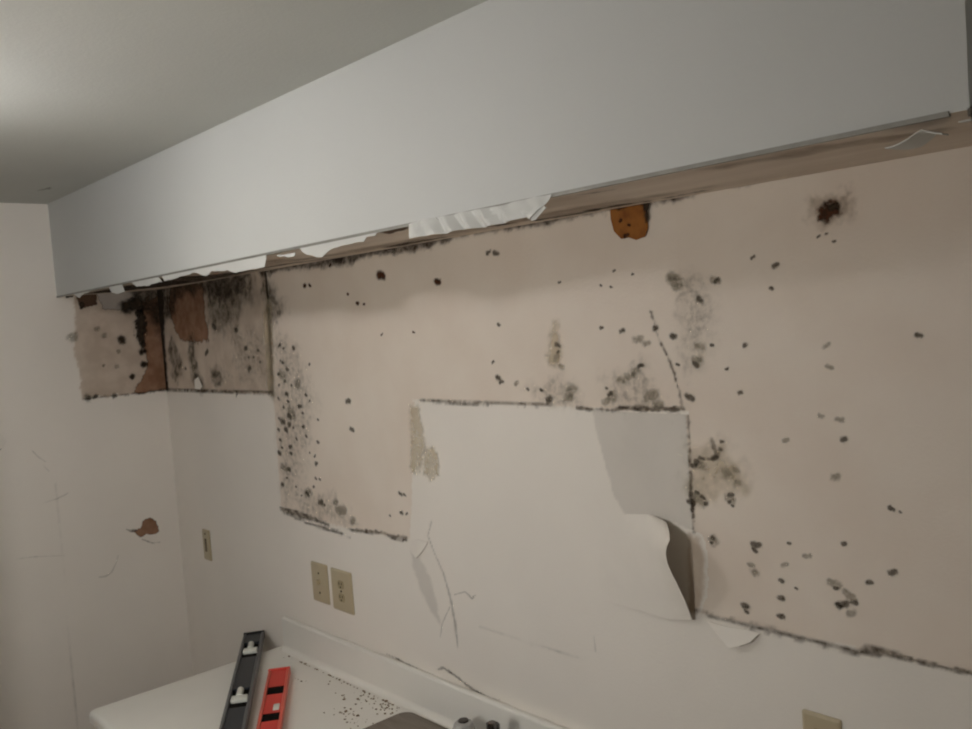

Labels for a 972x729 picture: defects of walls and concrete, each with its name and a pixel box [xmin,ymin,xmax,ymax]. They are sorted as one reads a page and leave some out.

leakage [493,203,633,231]
leakage [118,237,451,391]
leakage [277,344,346,512]
peeling [66,129,972,678]
leakage [831,581,858,609]